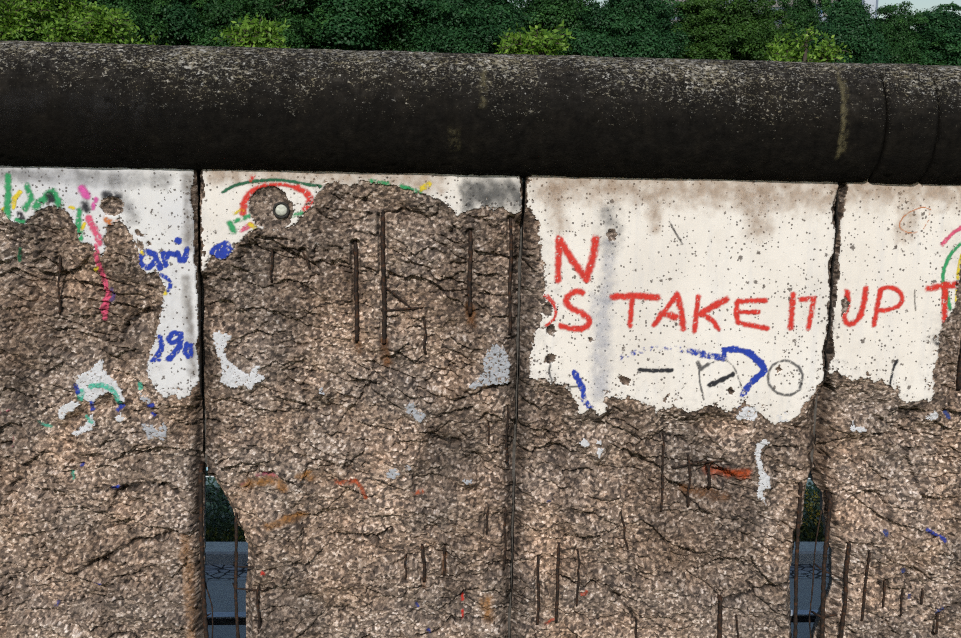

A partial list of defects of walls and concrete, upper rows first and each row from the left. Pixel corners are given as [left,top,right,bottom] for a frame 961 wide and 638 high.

spalling [0,169,961,638]